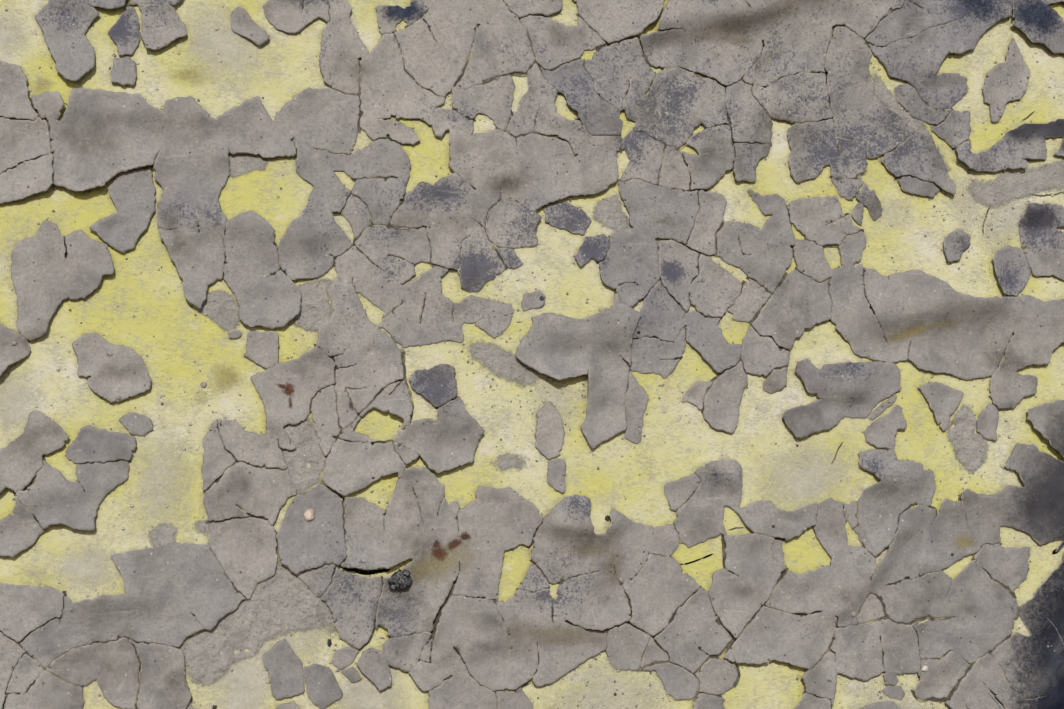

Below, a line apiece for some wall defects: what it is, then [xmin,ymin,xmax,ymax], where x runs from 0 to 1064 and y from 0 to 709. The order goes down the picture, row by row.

crack [0,98,56,188]
crack [292,59,517,293]
crack [381,1,953,413]
corrosion [279,384,293,408]
peeling [0,0,732,709]
peeling [263,0,1064,709]
crack [13,455,46,530]
crack [203,420,265,493]
corrosion [432,534,470,560]
crack [310,344,1041,709]
crack [1,591,84,709]
crack [91,637,149,709]